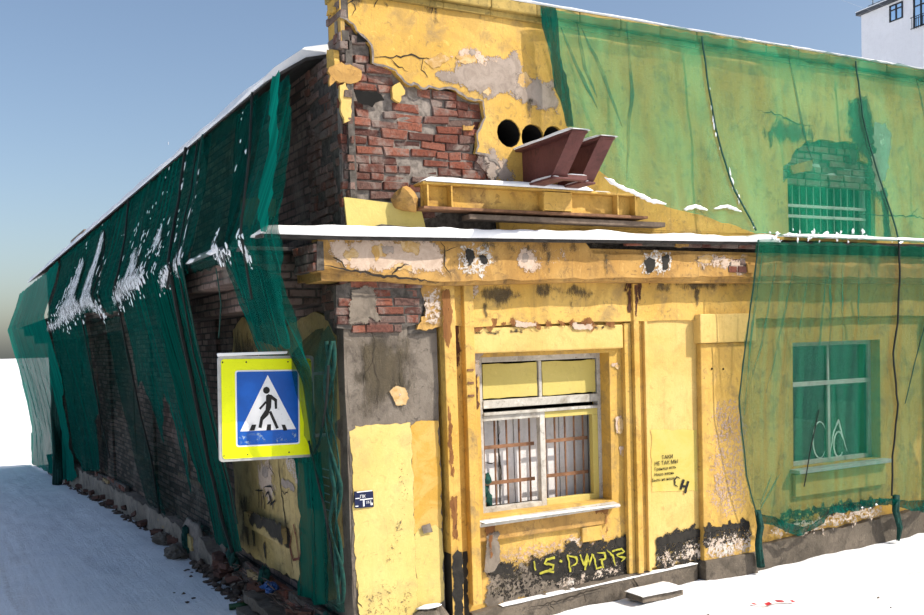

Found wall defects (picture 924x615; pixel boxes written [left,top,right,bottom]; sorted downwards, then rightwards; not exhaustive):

crack [376,53,429,77]
spalling [326,0,532,225]
spalling [292,240,447,333]
peeling [457,242,492,299]
water stain [481,287,516,317]
peeling [517,248,541,273]
peeling [623,243,756,276]
peeling [390,386,409,406]
peeling [258,458,297,505]
water stain [239,497,291,558]